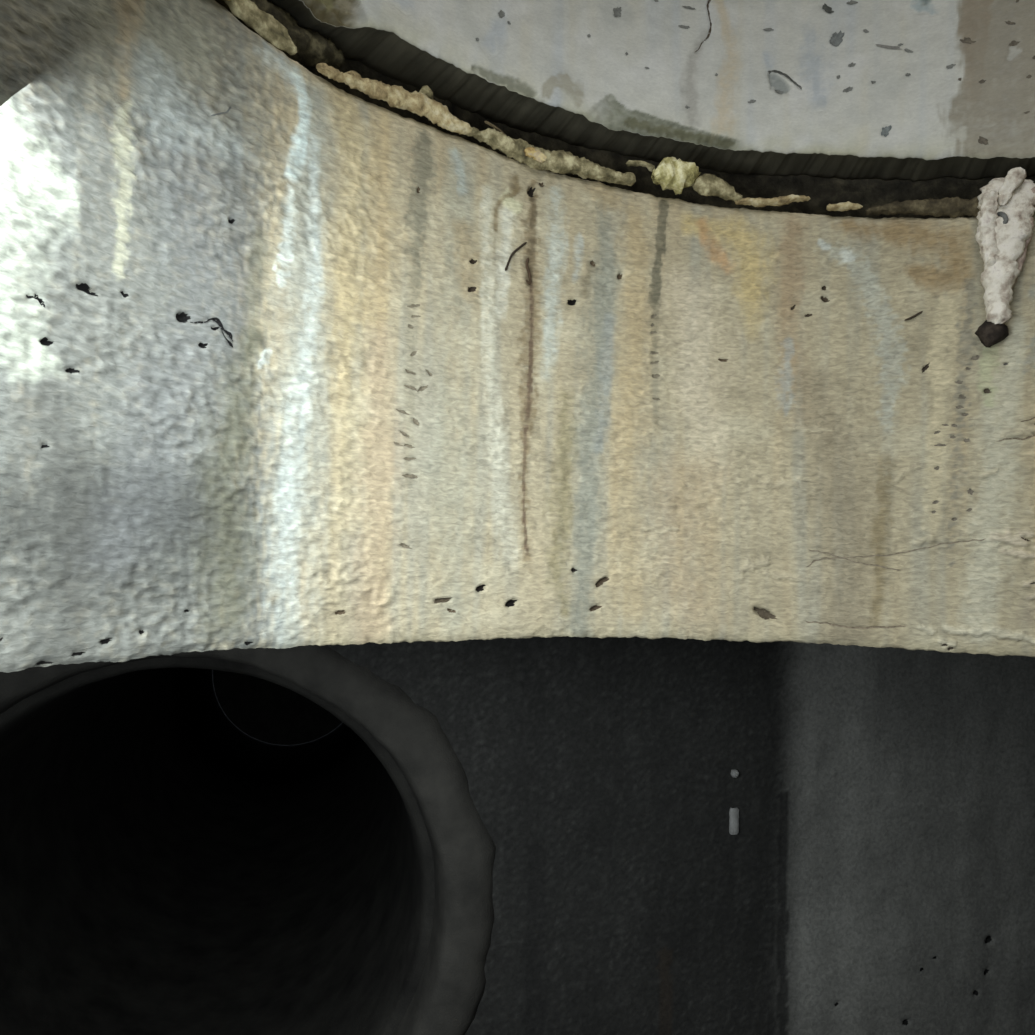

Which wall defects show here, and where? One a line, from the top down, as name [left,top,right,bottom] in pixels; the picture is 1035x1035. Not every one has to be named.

spalling [215,0,260,36]
spalling [250,0,372,70]
crack [695,0,712,52]
damp [908,0,1035,159]
crack [1000,417,1035,441]
damp [327,122,1035,1035]
crack [807,539,984,571]
crack [806,621,906,629]